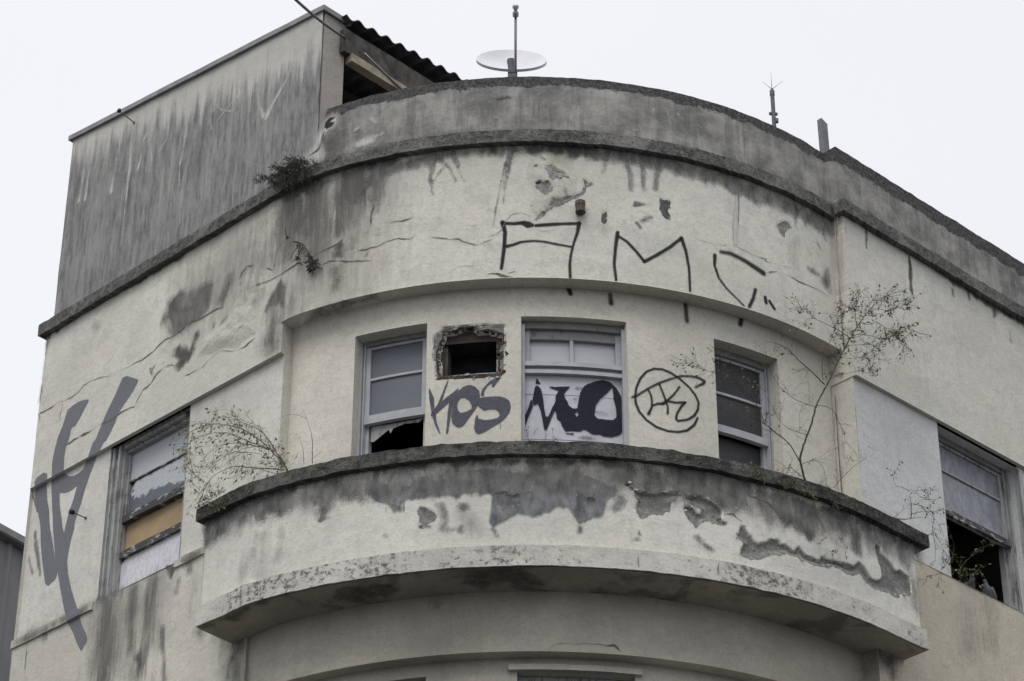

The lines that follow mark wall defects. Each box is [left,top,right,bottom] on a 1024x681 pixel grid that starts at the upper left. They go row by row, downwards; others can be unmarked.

damp [257,62,293,120]
damp [116,133,165,241]
peeling [534,165,593,221]
peeling [163,282,213,336]
damp [219,275,233,303]
crack [37,194,573,445]
damp [935,270,1023,324]
peeling [369,469,912,598]
damp [96,595,112,681]
damp [129,577,164,675]